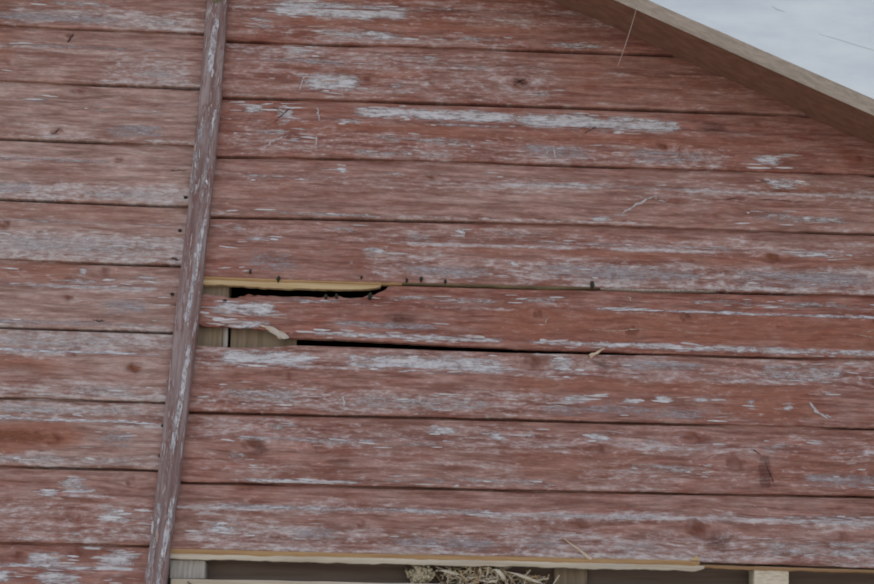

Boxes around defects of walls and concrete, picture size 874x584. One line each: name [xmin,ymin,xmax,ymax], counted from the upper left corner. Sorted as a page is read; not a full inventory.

peeling [247,0,419,41]
peeling [207,19,219,77]
peeling [339,105,679,135]
peeling [191,104,217,197]
peeling [185,220,343,328]
peeling [223,349,319,367]
peeling [340,351,519,374]
peeling [533,339,874,385]
peeling [170,345,191,453]
peeling [547,394,727,422]
peeling [0,497,175,584]
peeling [184,503,512,542]